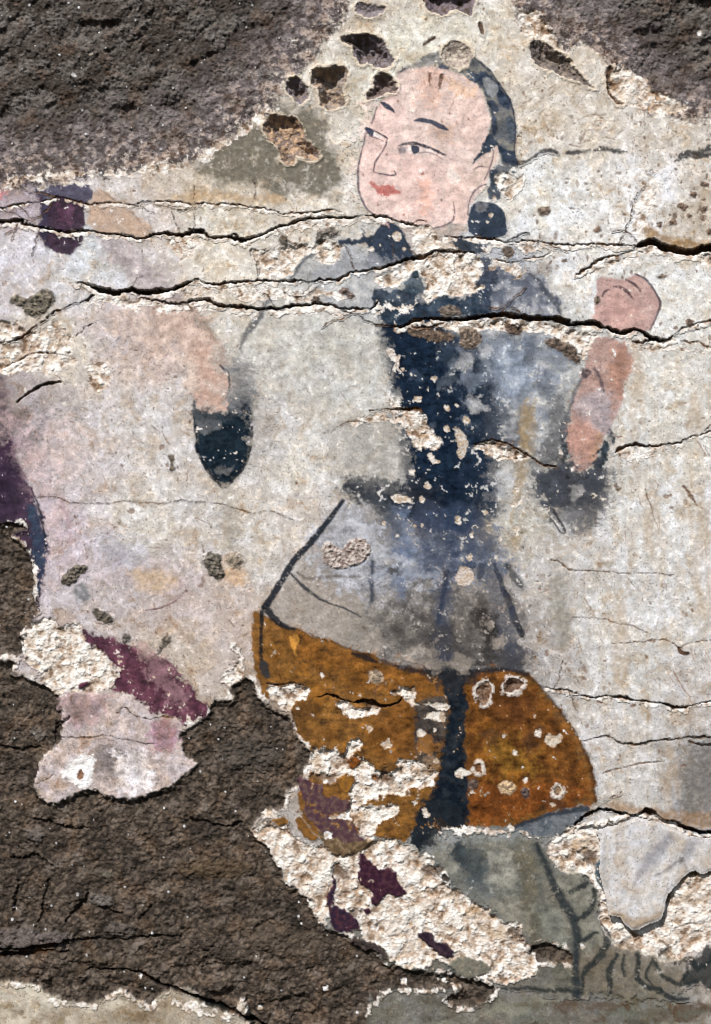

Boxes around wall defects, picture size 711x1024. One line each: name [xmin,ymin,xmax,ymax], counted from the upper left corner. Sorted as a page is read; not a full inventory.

spalling [0,0,401,196]
spalling [420,0,487,89]
spalling [505,0,711,129]
crack [0,177,711,403]
crack [614,423,711,455]
spalling [0,515,587,1024]
crack [543,660,711,835]
peeling [438,812,711,959]